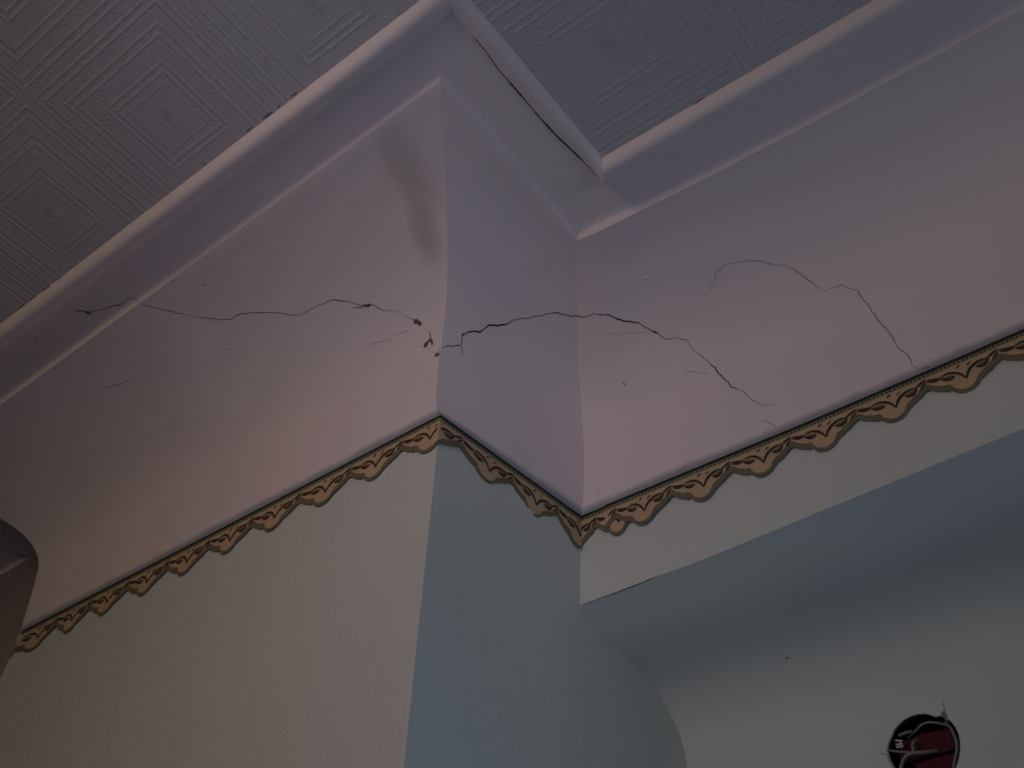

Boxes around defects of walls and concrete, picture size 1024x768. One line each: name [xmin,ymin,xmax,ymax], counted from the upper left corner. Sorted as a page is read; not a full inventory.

crack [473,36,598,177]
crack [77,297,422,344]
crack [435,312,777,427]
crack [706,260,937,369]